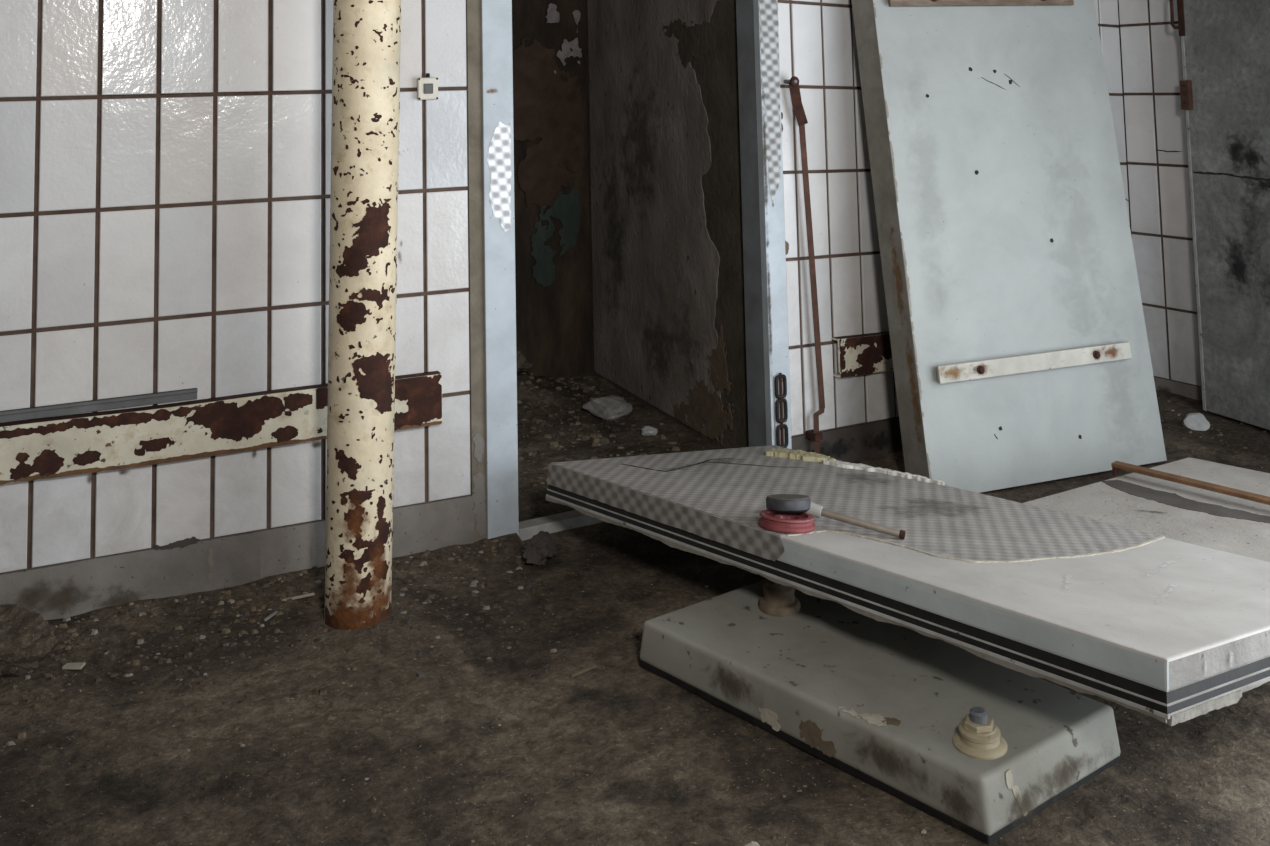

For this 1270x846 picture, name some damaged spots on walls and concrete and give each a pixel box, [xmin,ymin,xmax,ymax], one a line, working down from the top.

spalling [334,0,383,38]
spalling [373,6,401,47]
spalling [333,46,400,263]
leakage [1230,143,1258,169]
rust [332,199,391,332]
flaking render [512,0,722,437]
leakage [1231,245,1250,283]
spalling [366,248,397,387]
rust [0,383,328,485]
spalling [328,406,375,456]
rust [349,352,442,431]
rust [325,450,392,630]